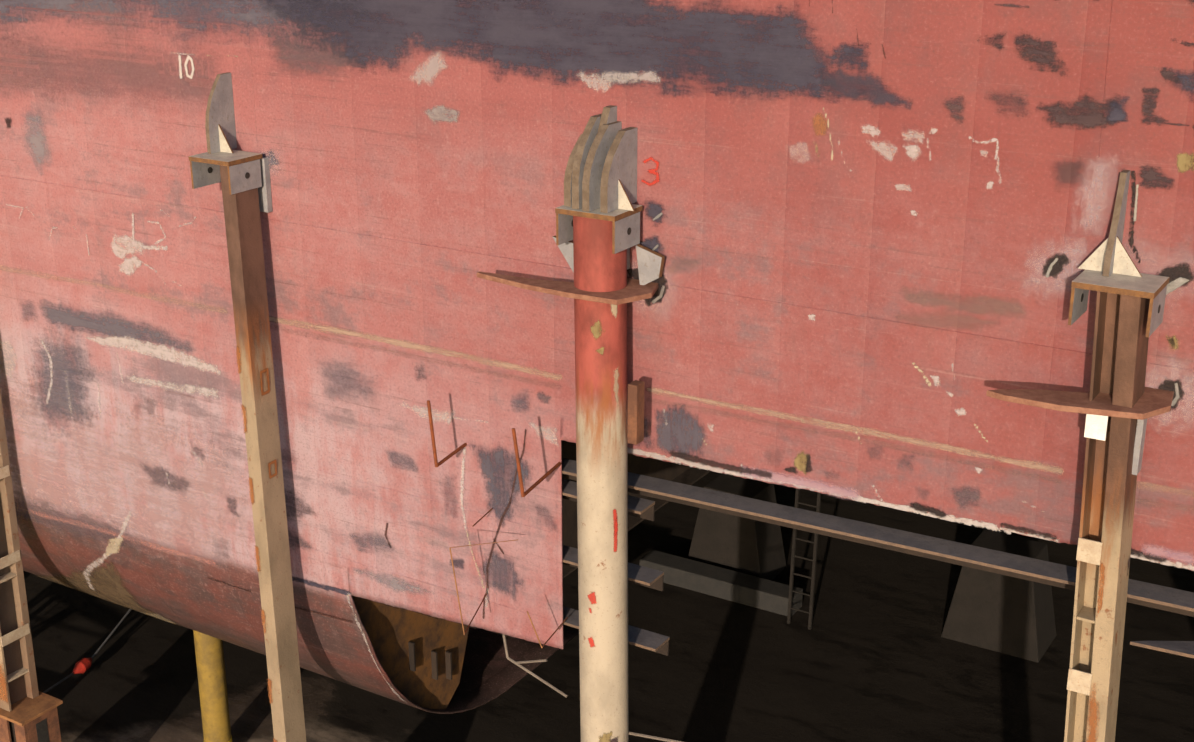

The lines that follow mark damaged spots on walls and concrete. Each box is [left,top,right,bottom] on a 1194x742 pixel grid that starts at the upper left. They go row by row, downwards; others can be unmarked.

peeling [0,0,911,107]
peeling [989,34,1064,73]
peeling [992,95,1129,129]
peeling [1142,88,1166,124]
peeling [1140,153,1194,188]